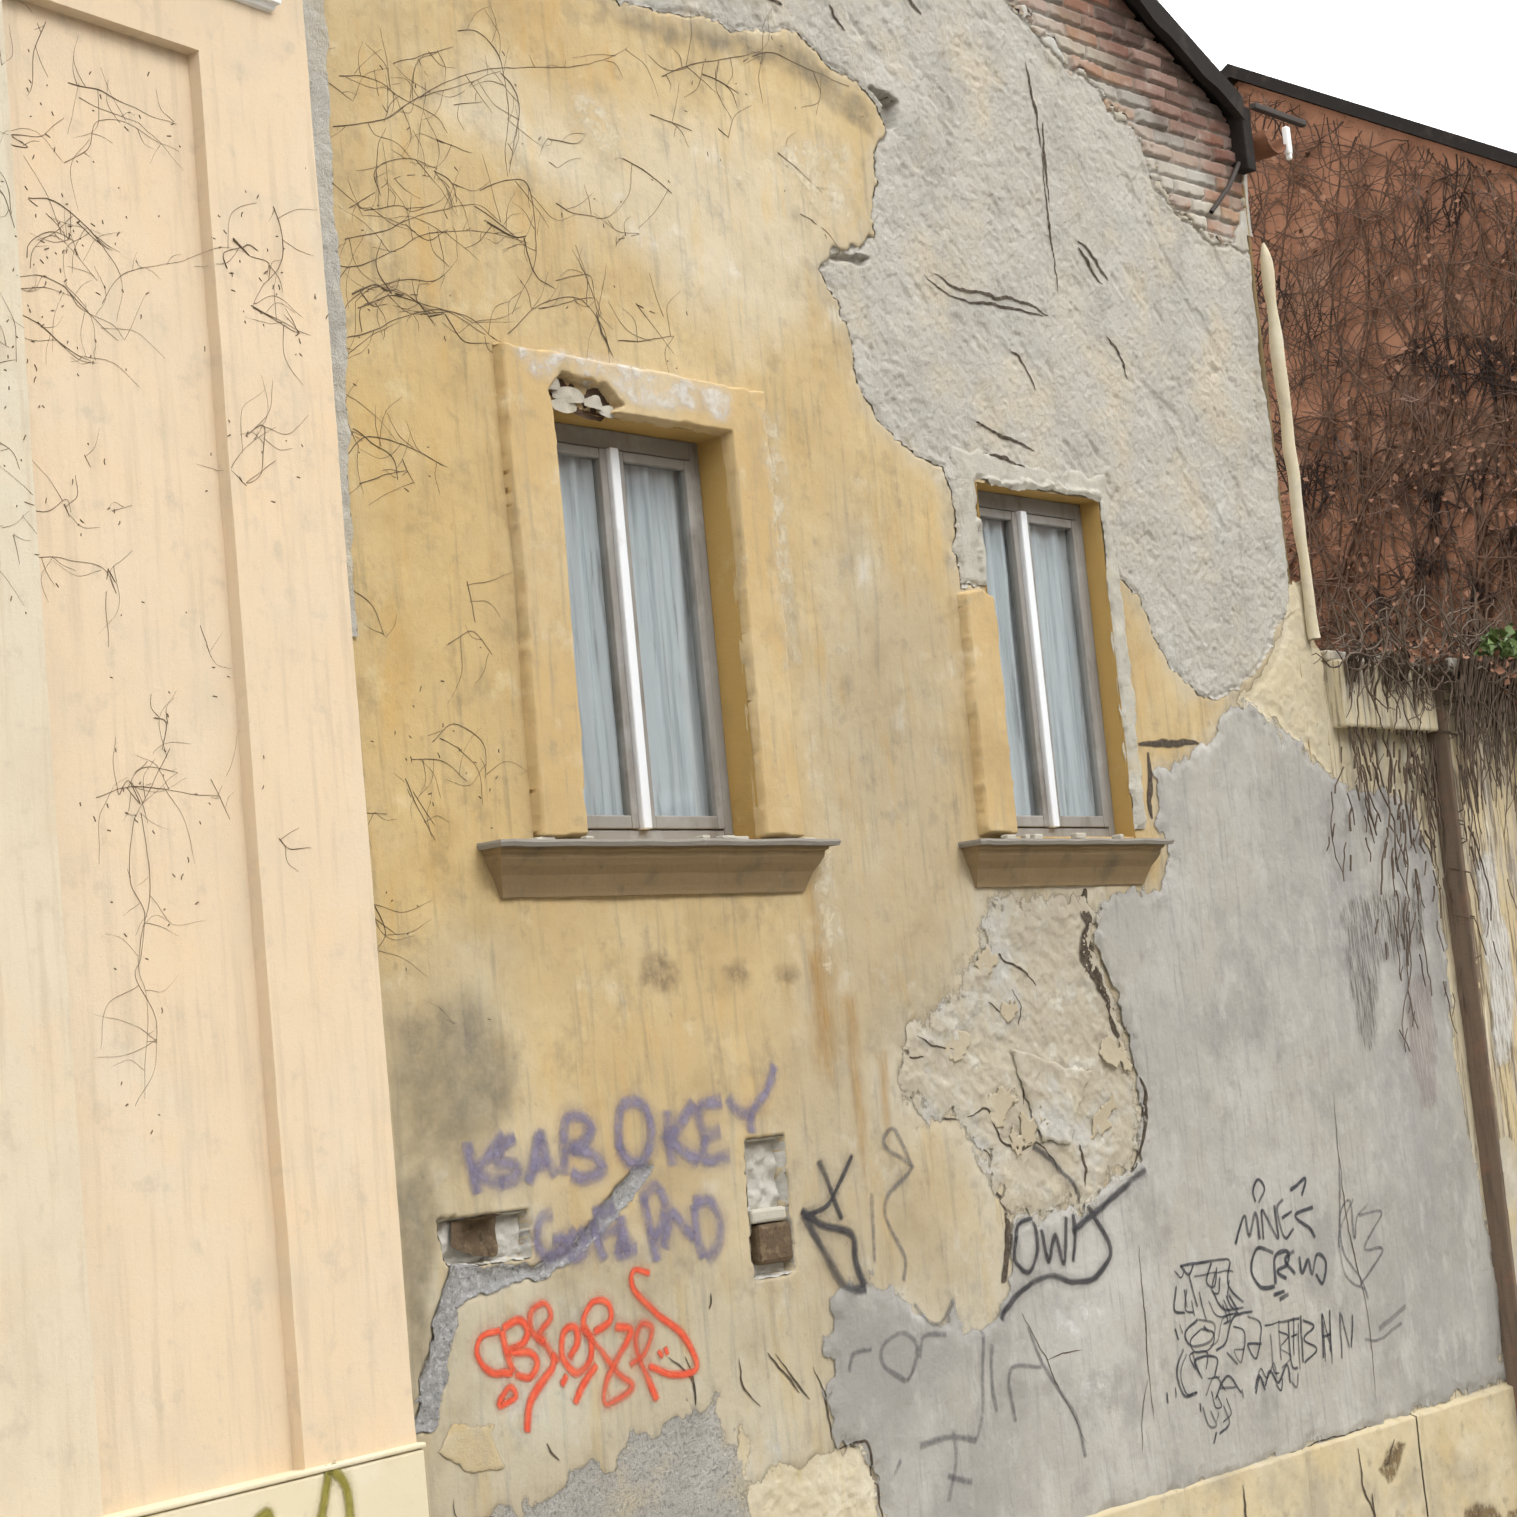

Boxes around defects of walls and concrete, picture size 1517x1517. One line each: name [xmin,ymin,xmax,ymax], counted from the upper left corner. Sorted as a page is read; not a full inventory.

flaking render [548,378,614,422]
flaking render [617,0,1333,773]
peeling [898,892,1149,1225]
peeling [414,1160,654,1433]
peeling [491,1391,886,1517]